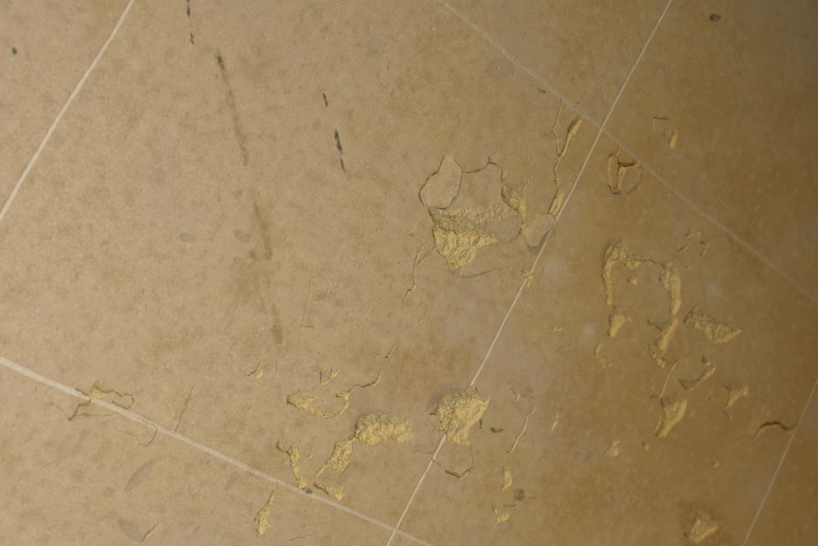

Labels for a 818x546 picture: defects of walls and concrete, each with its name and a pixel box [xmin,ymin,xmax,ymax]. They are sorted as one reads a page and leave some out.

spalling [406,146,556,279]
spalling [600,241,747,366]
spalling [285,362,352,420]
spalling [274,385,491,502]
spalling [641,388,689,453]
crack [753,419,800,442]
spalling [680,509,719,545]